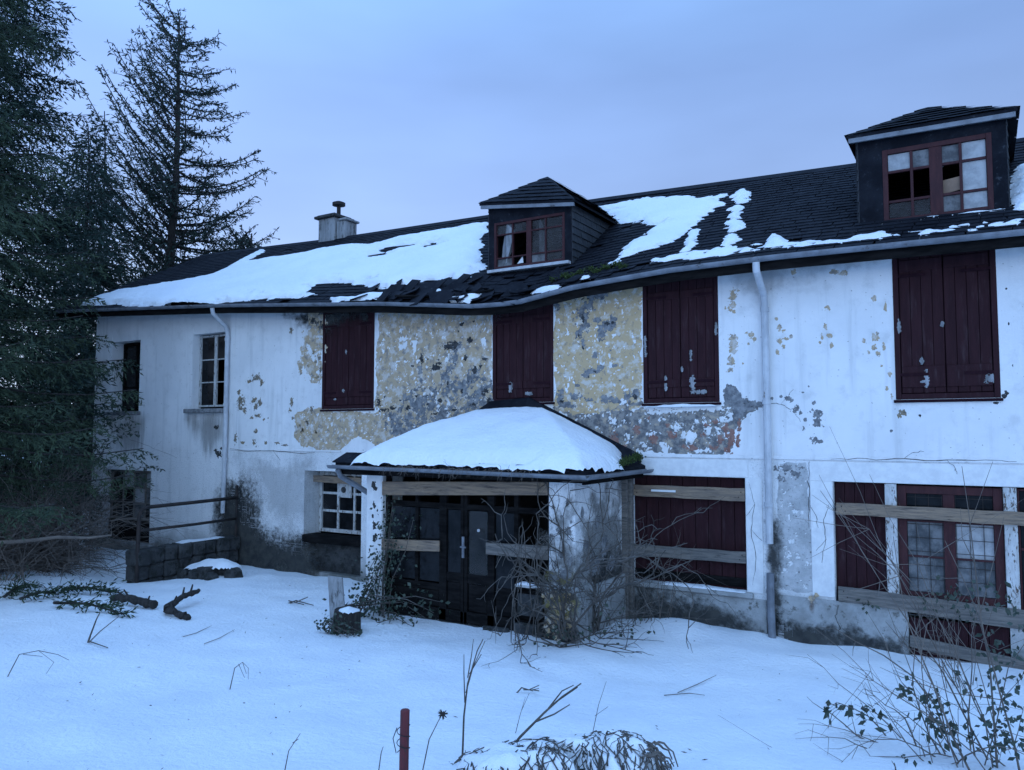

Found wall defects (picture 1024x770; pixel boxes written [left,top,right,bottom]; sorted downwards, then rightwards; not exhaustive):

peeling [214,313,494,458]
peeling [553,287,763,455]
damp [213,480,319,576]